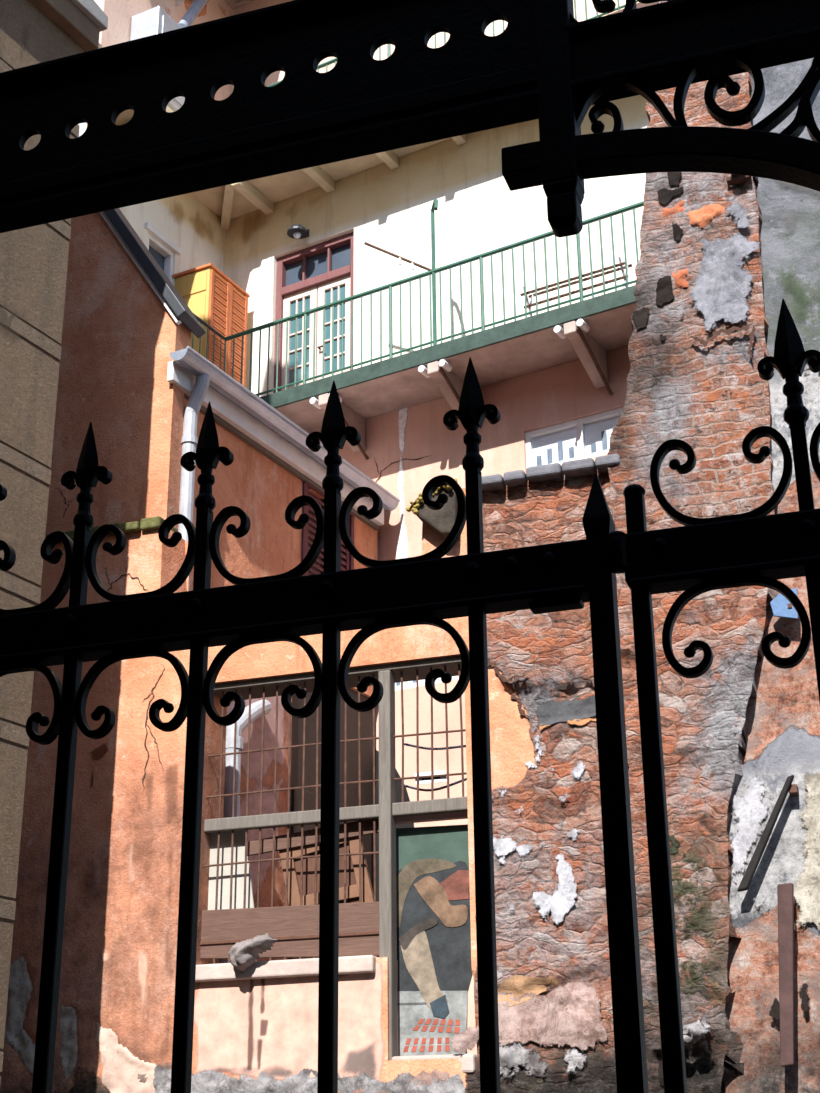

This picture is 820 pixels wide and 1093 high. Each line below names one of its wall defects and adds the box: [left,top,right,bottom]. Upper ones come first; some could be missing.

flaking render [632,172,761,334]
crack [374,456,427,481]
crack [142,668,165,792]
spalling [525,694,596,774]
flaking render [493,821,579,924]
flaking render [728,777,773,883]
flaking render [793,771,820,931]
flaking render [4,957,35,1073]
flaking render [96,1023,171,1093]
flaking render [191,976,319,1093]
flaking render [338,963,466,1093]
flaking render [498,974,608,1051]